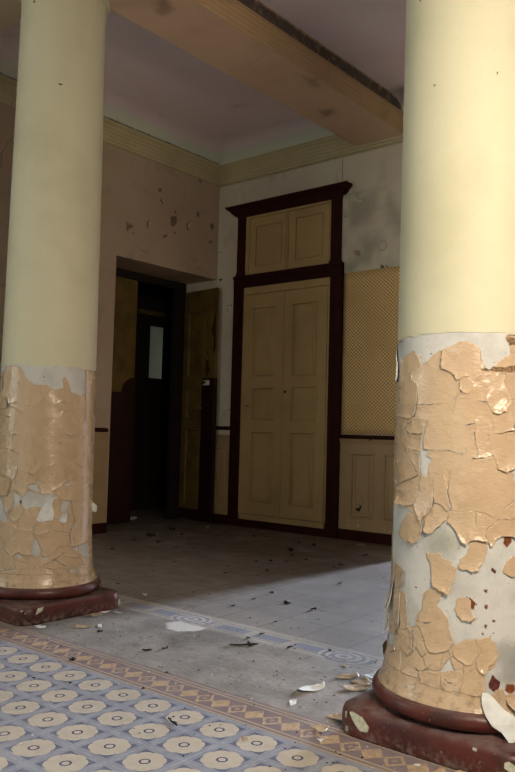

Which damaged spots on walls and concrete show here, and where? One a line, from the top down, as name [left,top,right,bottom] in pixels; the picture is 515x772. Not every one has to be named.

peeling [0,366,97,589]
peeling [342,334,515,743]
spalling [310,711,369,742]